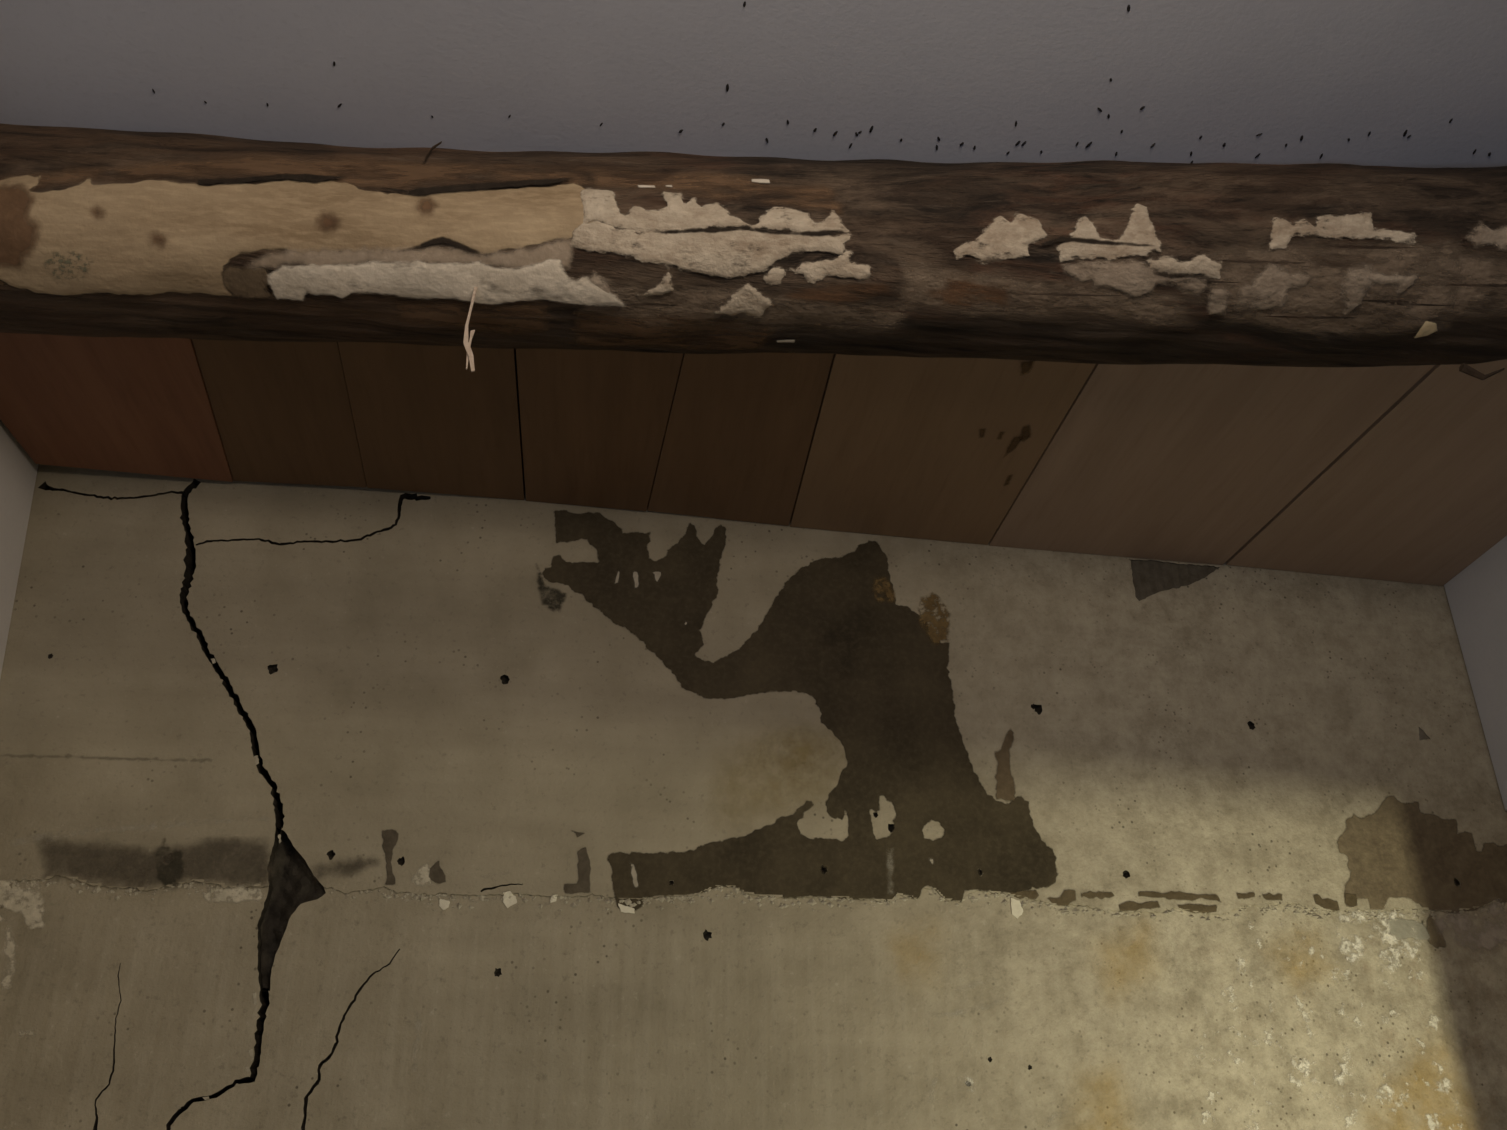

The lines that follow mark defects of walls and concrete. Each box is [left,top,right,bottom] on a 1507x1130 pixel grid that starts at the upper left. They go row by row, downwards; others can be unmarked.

peeling [570,188,872,318]
peeling [953,203,1418,315]
peeling [1466,223,1507,250]
peeling [1414,321,1437,338]
spalling [1130,559,1220,601]
damp [538,510,1058,910]
crack [38,479,431,1130]
damp [44,840,270,887]
damp [1250,796,1507,989]
damp [1219,958,1450,1128]
damp [1426,1114,1462,1130]